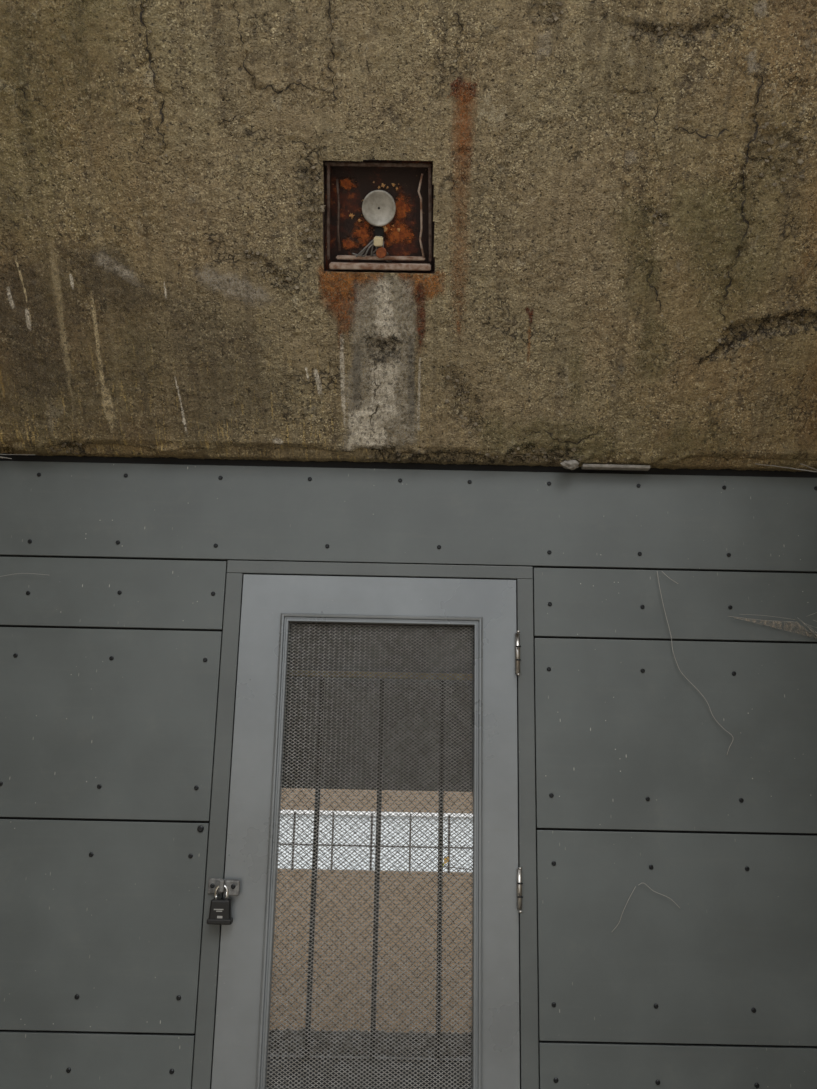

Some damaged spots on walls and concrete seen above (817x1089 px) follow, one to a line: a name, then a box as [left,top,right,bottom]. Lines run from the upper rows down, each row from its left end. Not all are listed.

crack [136,0,168,158]
crack [218,0,338,123]
crack [453,3,465,65]
corrosion [342,183,414,249]
corrosion [319,268,381,339]
corrosion [400,271,443,347]
water stain [340,278,421,451]